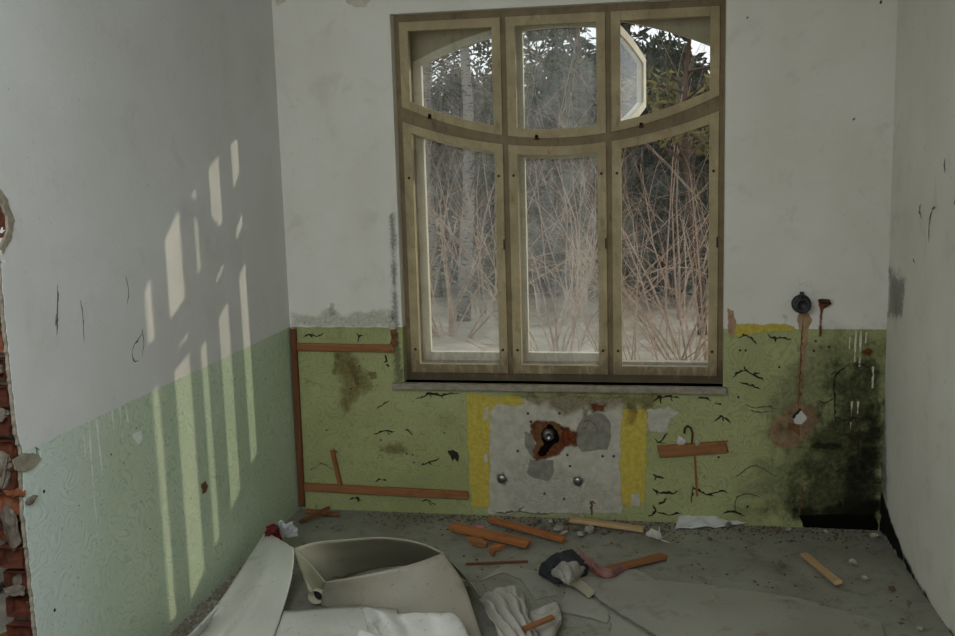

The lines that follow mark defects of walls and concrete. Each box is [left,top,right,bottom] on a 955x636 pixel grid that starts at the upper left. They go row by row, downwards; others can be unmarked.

spalling [0,189,53,636]
flaking render [483,396,640,516]
flaking render [788,408,807,437]
damp [787,331,929,601]